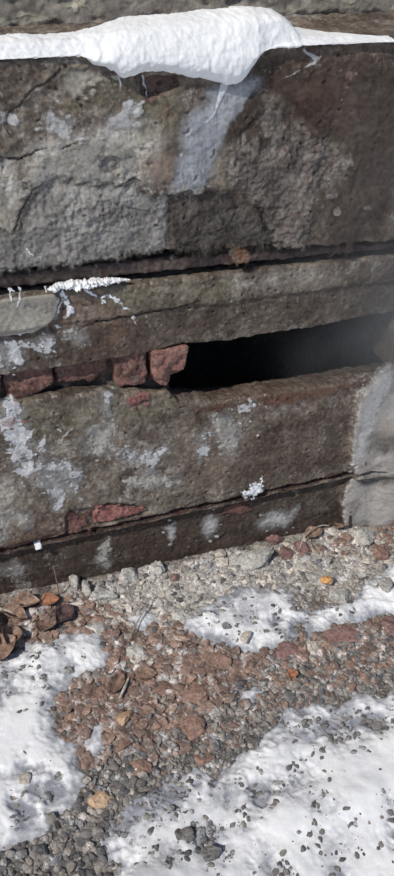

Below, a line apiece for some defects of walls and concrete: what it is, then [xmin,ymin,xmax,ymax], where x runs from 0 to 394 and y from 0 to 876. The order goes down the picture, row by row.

crack [4,63,61,136]
crack [7,142,77,161]
leakage [145,79,268,191]
leakage [276,65,394,256]
crack [12,184,42,233]
leakage [0,394,84,511]
leakage [197,398,267,460]
leakage [0,509,344,595]